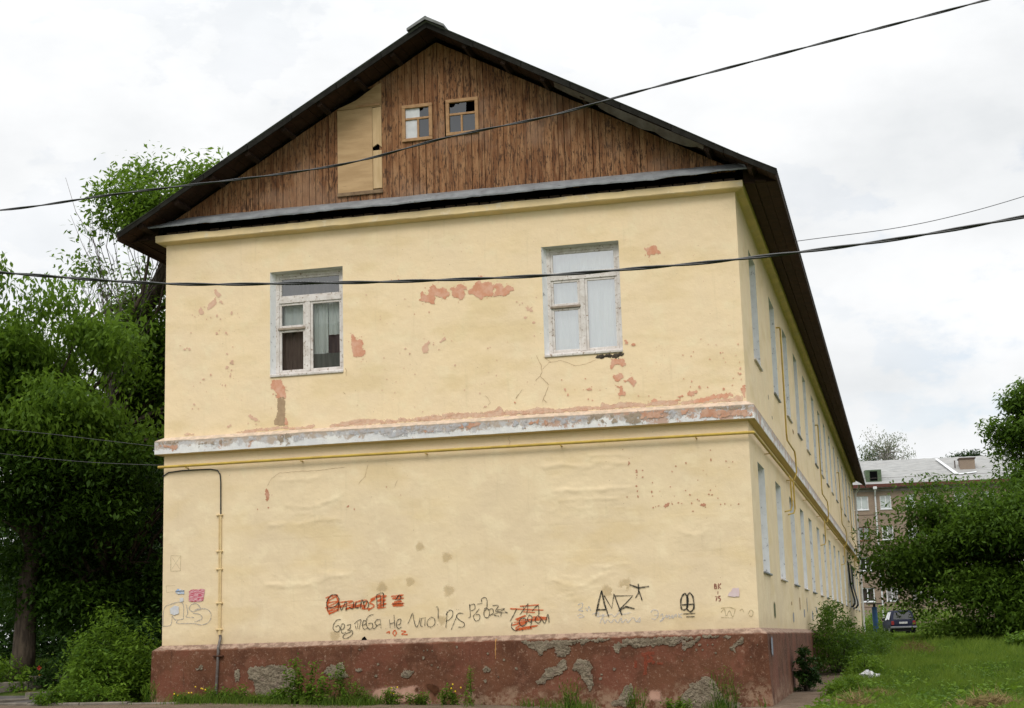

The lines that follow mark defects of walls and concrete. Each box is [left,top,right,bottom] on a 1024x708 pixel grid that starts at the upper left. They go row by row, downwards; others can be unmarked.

peeling [644,245,661,261]
peeling [419,276,537,337]
peeling [348,333,365,362]
peeling [227,340,752,441]
spalling [324,662,362,679]
spalling [521,634,744,691]